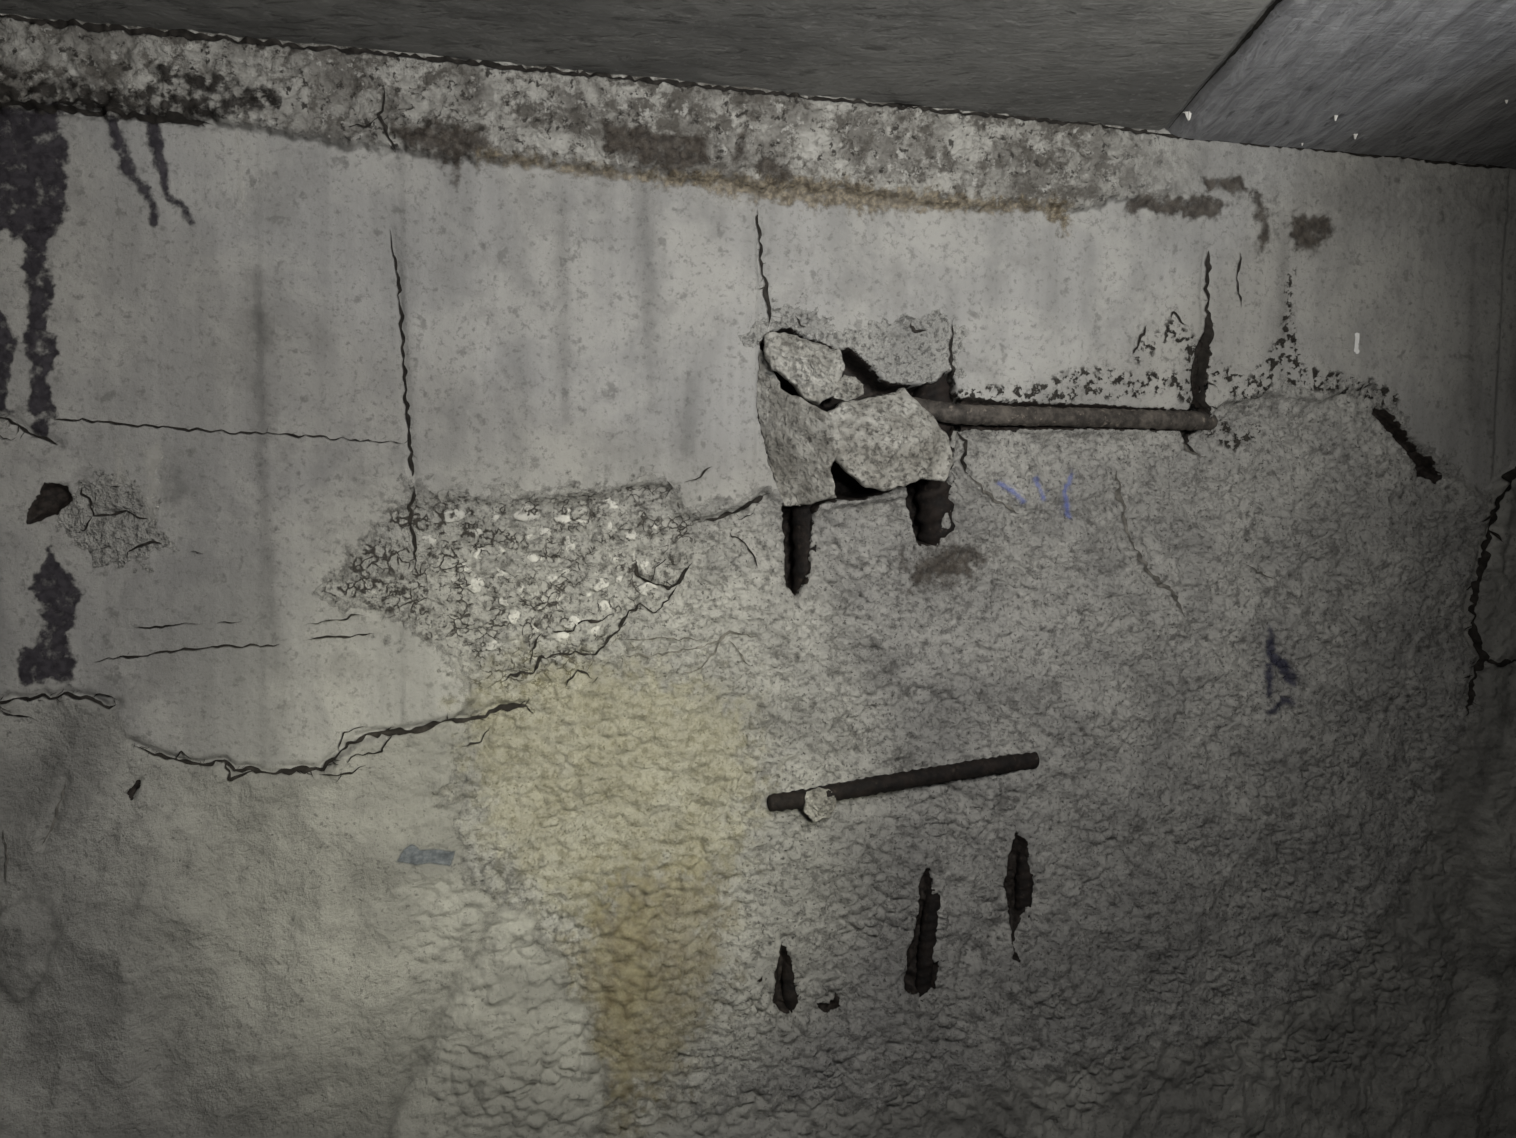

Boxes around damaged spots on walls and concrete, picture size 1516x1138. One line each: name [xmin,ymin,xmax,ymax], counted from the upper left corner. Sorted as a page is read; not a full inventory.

water stain [0,64,281,437]
crack [0,231,770,783]
spalling [313,270,1492,1122]
corrosion [767,752,1040,812]
crack [957,432,1016,513]
crack [1115,472,1185,616]
crack [1134,251,1242,457]
crack [1460,466,1516,716]